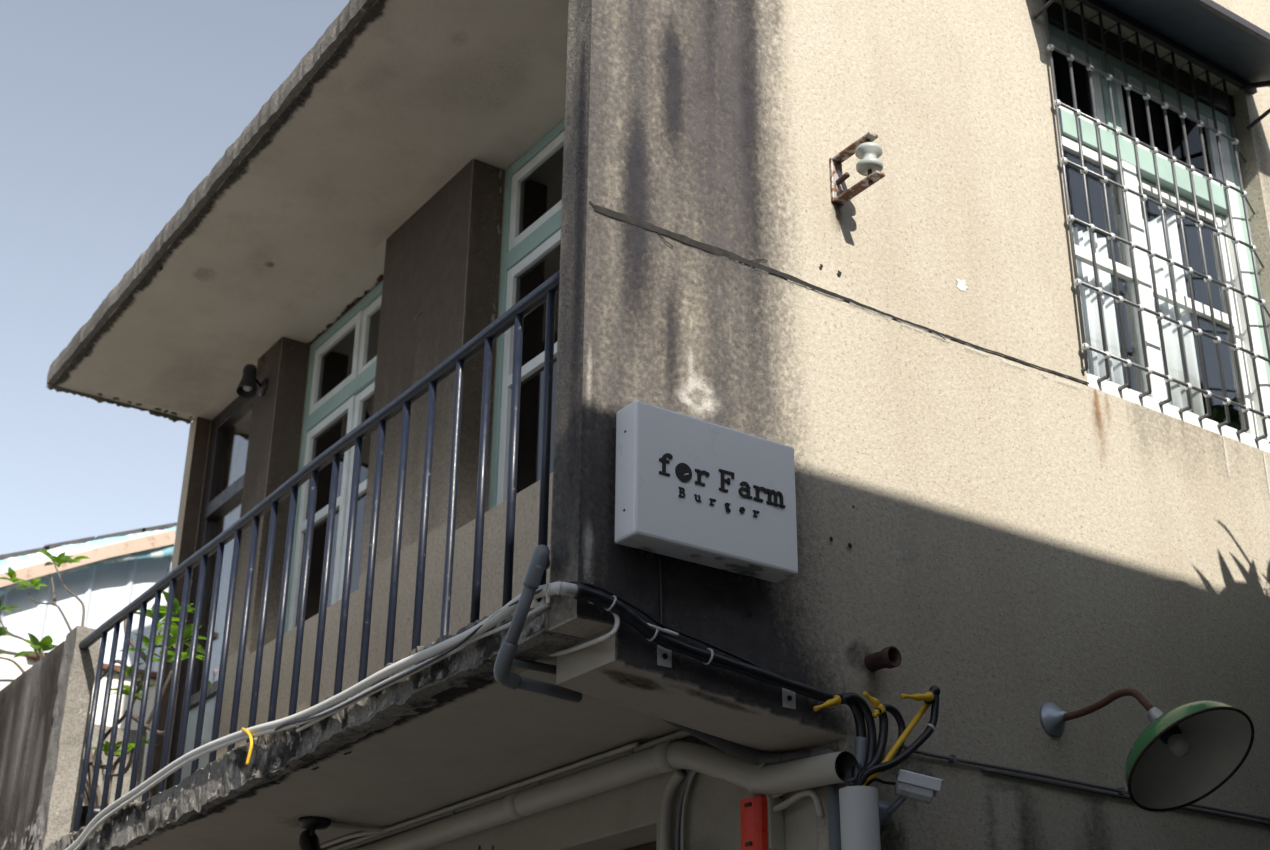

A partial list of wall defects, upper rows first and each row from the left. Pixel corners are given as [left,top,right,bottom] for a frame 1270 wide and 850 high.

leakage [550,0,843,731]
crack [589,201,1089,384]
leakage [171,417,211,626]
leakage [0,641,64,850]
peeling [1,805,100,850]
leakage [65,639,181,850]
leakage [228,703,347,780]
spalling [112,641,496,850]
leakage [411,643,455,689]
leakage [475,619,501,661]